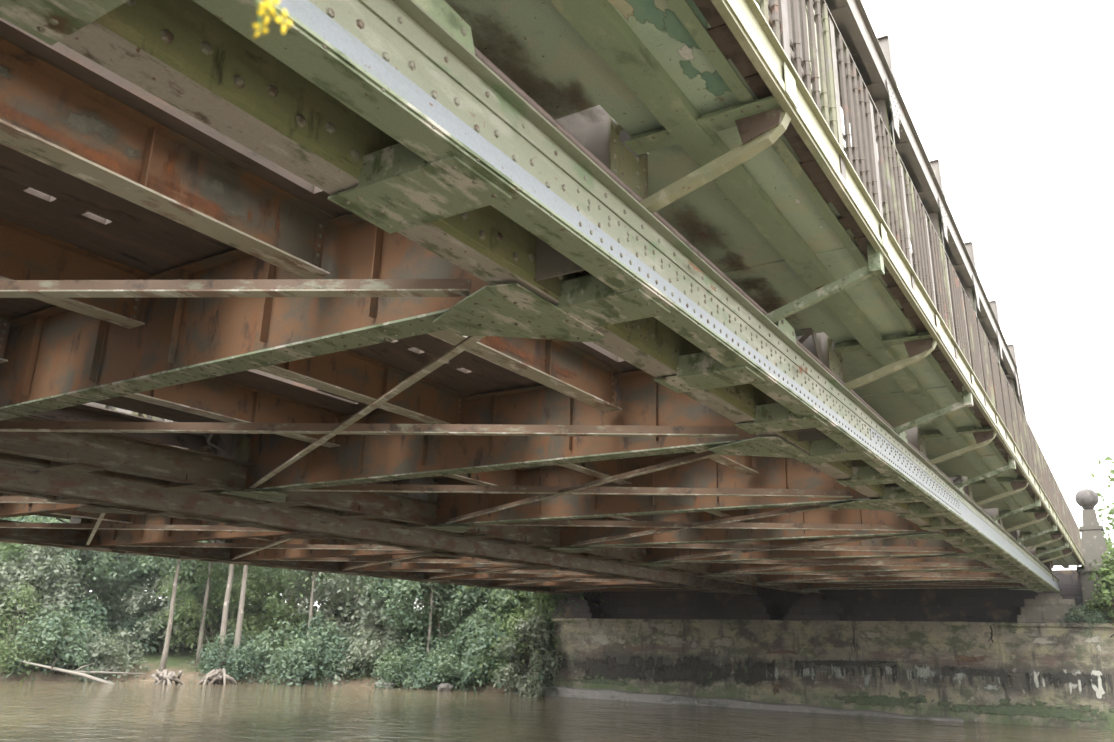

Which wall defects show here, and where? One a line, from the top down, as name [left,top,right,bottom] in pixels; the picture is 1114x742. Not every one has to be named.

corrosion [477,40,595,118]
peeling [608,0,732,96]
corrosion [0,105,224,220]
leakage [574,634,1013,690]
leakage [1026,669,1113,699]